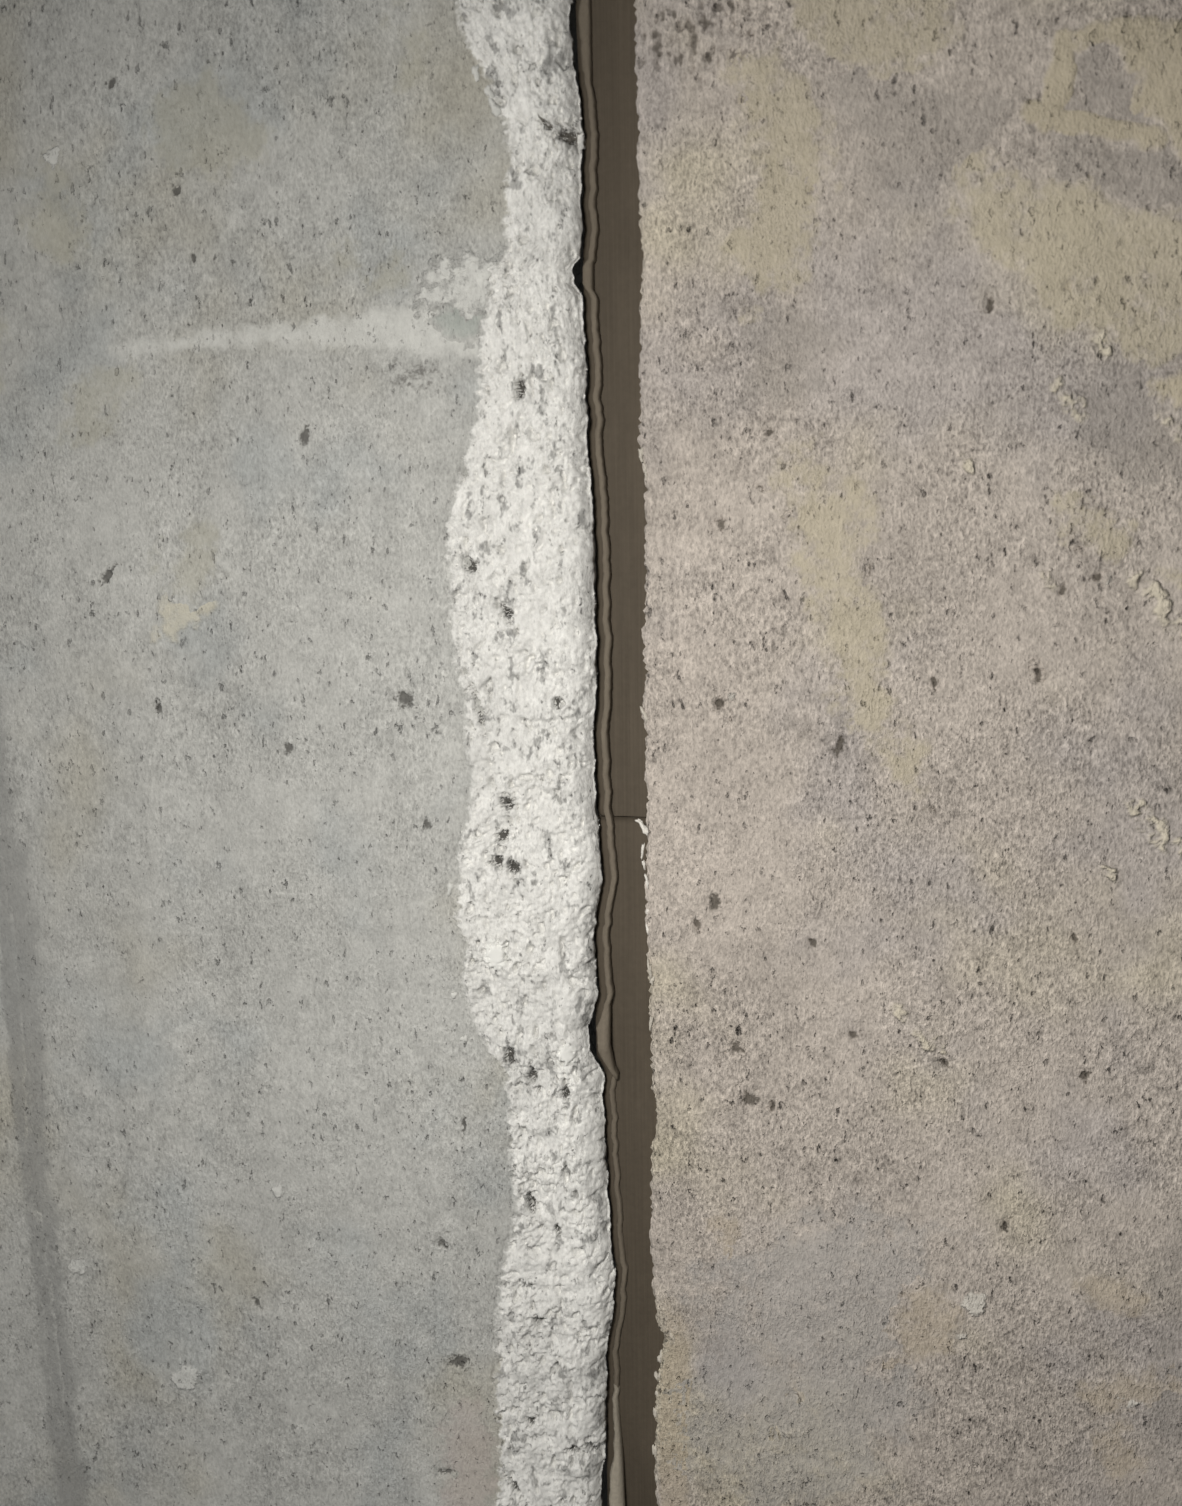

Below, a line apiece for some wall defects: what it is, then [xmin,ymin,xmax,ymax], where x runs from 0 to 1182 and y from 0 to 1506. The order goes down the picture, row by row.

damp [0,598,94,1506]
spalling [367,0,616,1506]